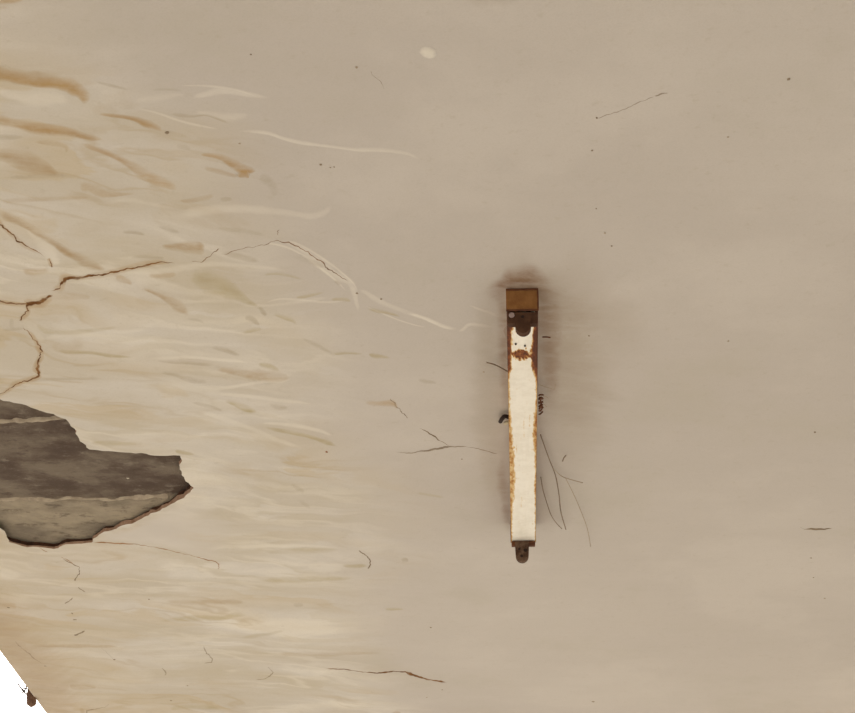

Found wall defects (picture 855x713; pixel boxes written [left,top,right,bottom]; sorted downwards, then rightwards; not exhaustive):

leakage [0,62,472,335]
crack [0,218,349,398]
leakage [0,528,10,551]
leakage [0,565,166,713]
spalling [0,399,193,549]
crack [92,541,219,570]
leakage [1,317,340,451]
leakage [147,597,387,659]
leakage [233,540,369,585]
crack [324,668,447,683]
crack [390,398,499,454]
corrosion [464,239,658,536]